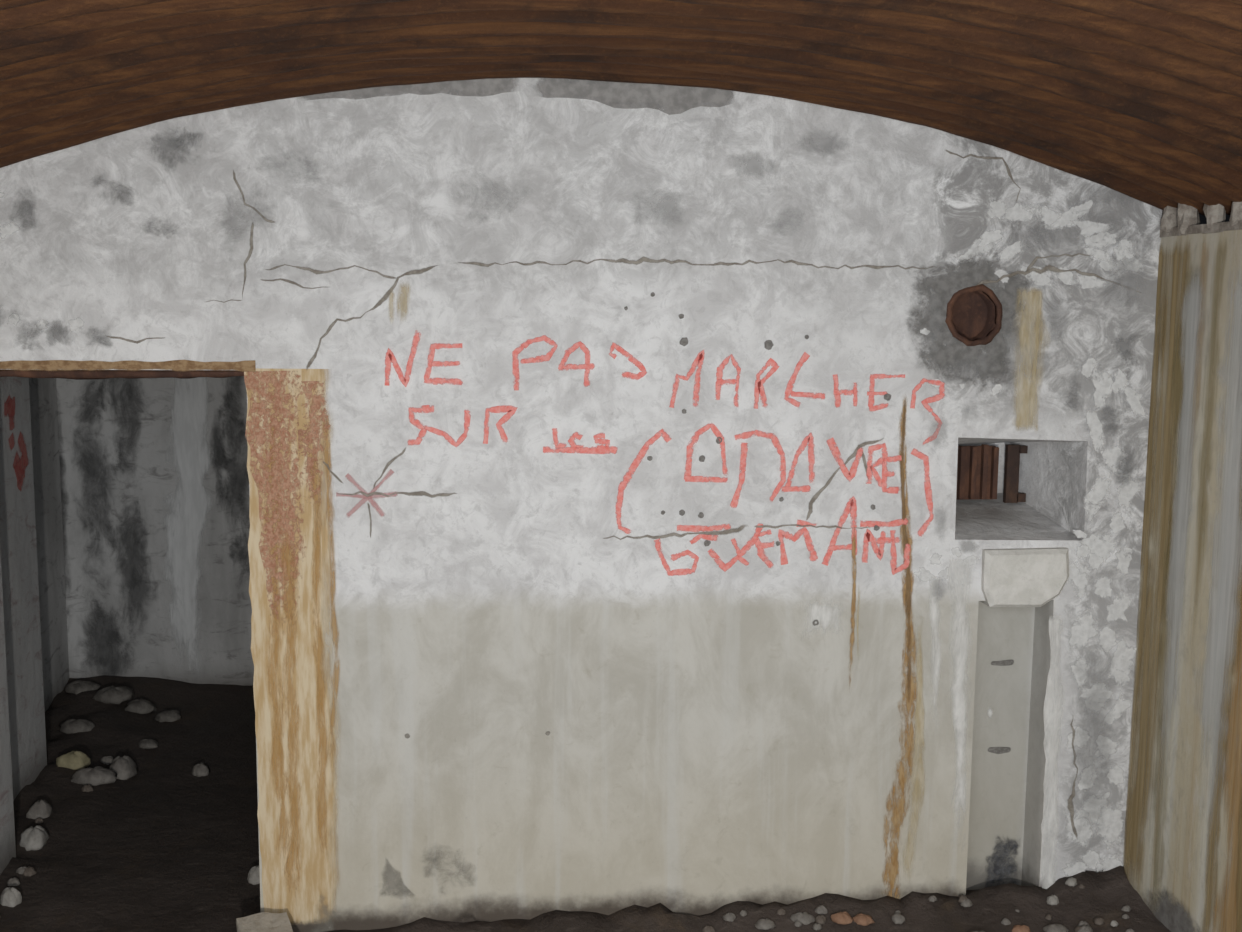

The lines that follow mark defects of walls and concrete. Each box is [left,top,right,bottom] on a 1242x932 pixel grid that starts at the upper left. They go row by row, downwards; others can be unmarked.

crack [207,171,930,368]
leakage [911,258,1028,384]
crack [976,253,1138,292]
leakage [75,378,149,620]
corrosion [0,360,339,923]
leakage [164,376,249,666]
crack [323,448,456,537]
crack [604,439,882,540]
corrosion [883,404,924,898]
corrosion [1125,247,1189,873]
corrosion [1204,561,1242,932]
leakage [1152,892,1195,932]